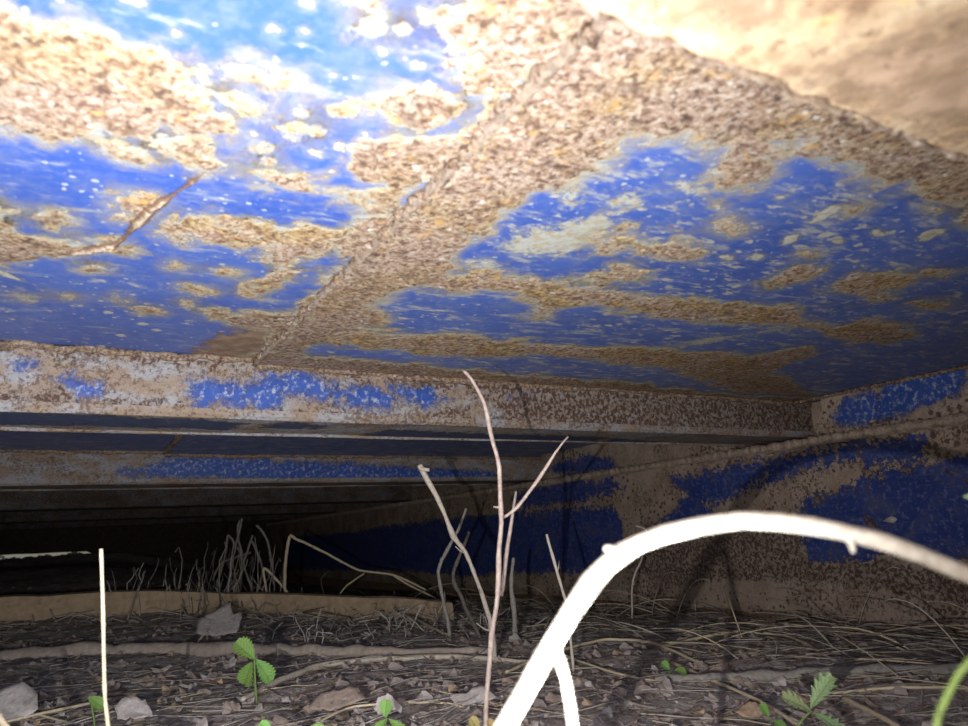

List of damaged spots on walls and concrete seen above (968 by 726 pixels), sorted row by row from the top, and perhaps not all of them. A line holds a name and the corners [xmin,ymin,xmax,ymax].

peeling [401,56,439,91]
peeling [308,141,346,159]
peeling [669,176,709,197]
crack [0,177,200,262]
corrosion [0,0,968,432]
peeling [497,192,646,260]
peeling [806,205,842,224]
peeling [757,250,827,291]
peeling [823,268,965,311]
peeling [117,456,508,479]
peeling [659,369,968,565]
corrosion [627,529,968,607]